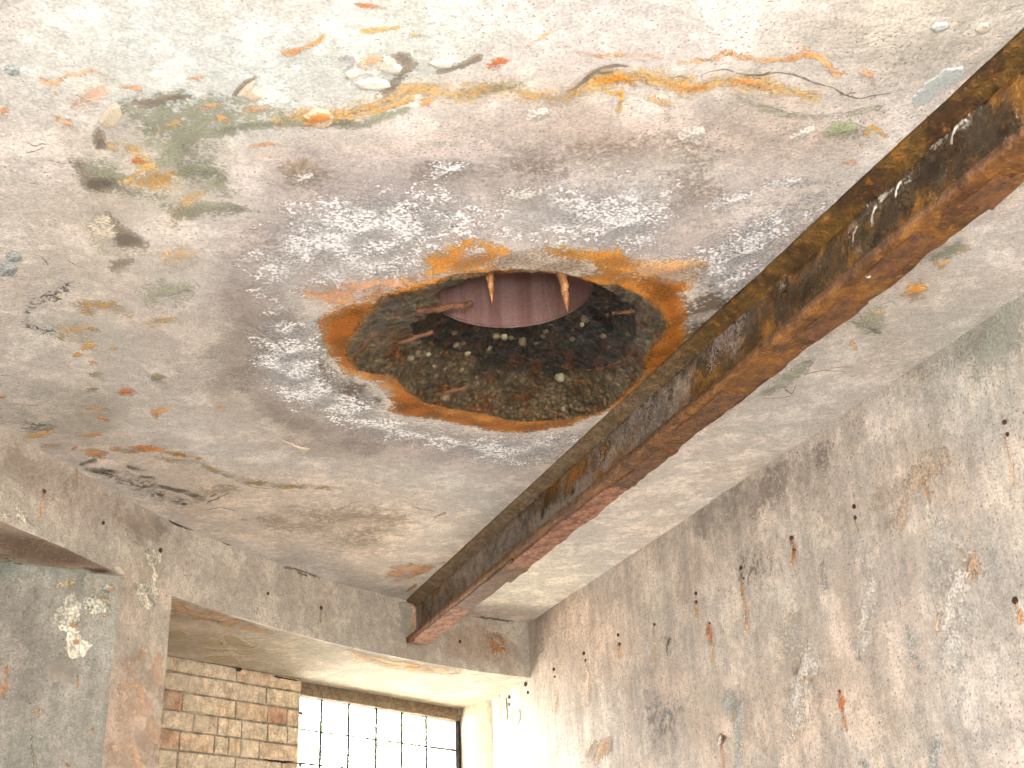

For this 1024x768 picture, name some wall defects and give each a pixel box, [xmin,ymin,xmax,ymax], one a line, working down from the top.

corrosion [487,57,509,69]
corrosion [678,46,845,77]
water stain [132,94,190,108]
corrosion [330,70,816,123]
crack [668,69,902,99]
corrosion [864,124,887,137]
water stain [77,161,140,197]
peeling [462,245,487,258]
corrosion [904,279,928,295]
water stain [152,148,838,469]
corrosion [298,238,708,433]
spalling [345,249,669,422]